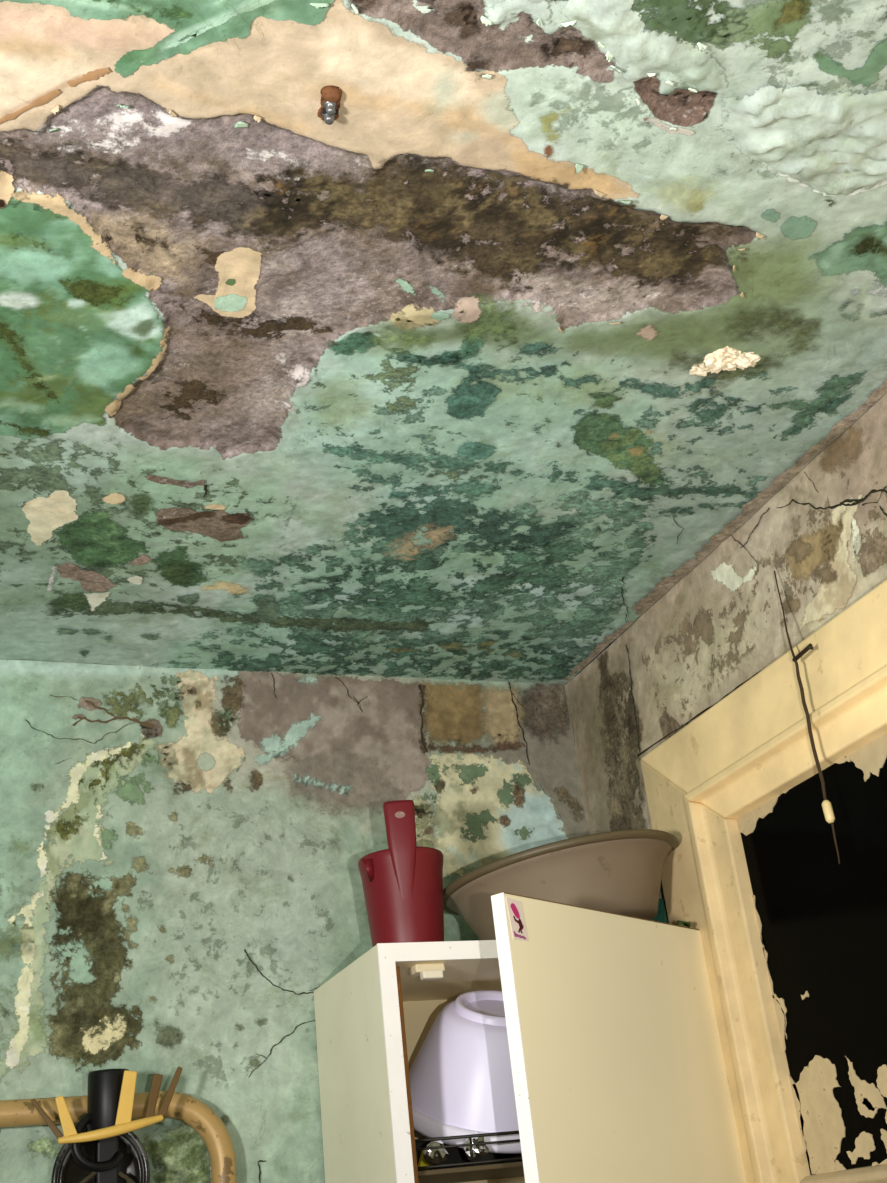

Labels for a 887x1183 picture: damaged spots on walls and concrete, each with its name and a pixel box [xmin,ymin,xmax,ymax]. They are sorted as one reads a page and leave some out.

spalling [0,0,766,460]
peeling [102,492,125,504]
peeling [155,503,253,543]
water stain [0,295,887,831]
crack [731,472,887,564]
water stain [126,821,142,839]
water stain [168,854,214,878]
peeling [0,667,568,1081]
water stain [45,856,183,1073]